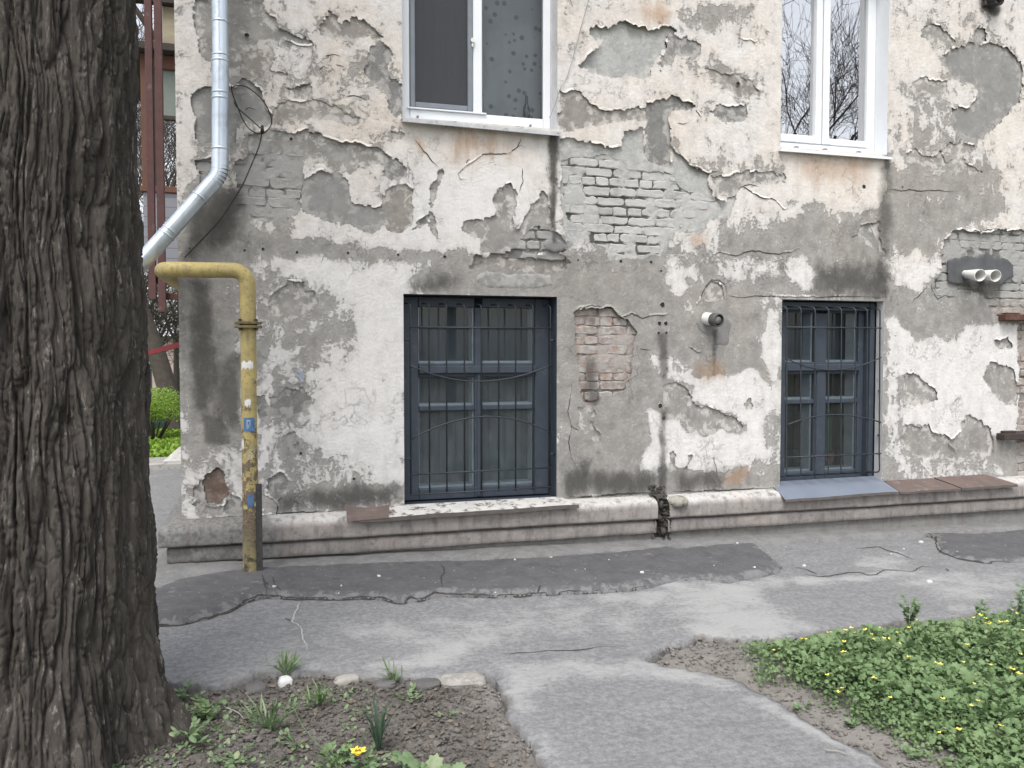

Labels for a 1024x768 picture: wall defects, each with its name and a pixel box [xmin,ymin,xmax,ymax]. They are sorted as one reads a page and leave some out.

spalling [192,0,212,67]
spalling [578,18,701,79]
spalling [190,86,212,184]
flaking render [228,0,445,239]
crack [416,139,525,189]
flaking render [461,87,786,274]
spalling [905,22,1023,178]
leakage [191,282,214,408]
flaking render [932,226,1024,475]
leakage [565,410,667,495]
leakage [680,474,721,489]
spalling [901,414,994,464]